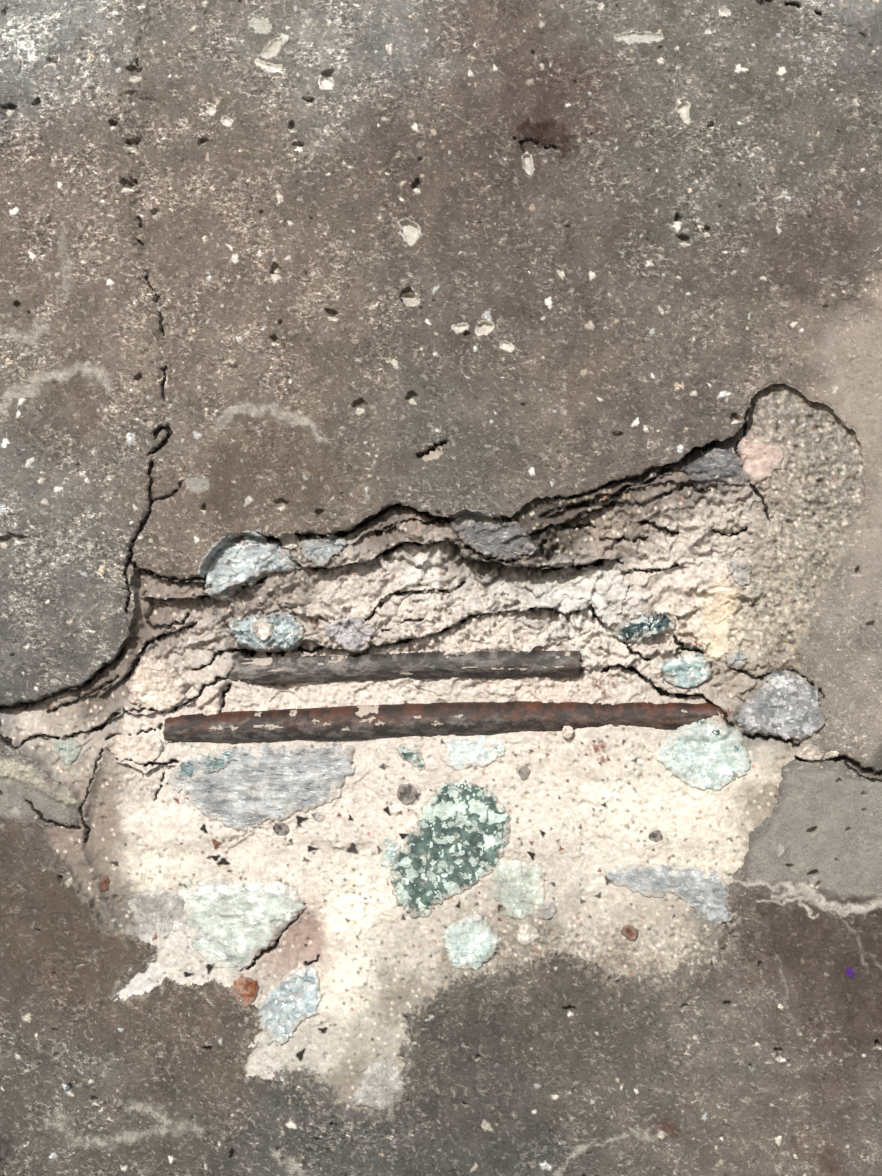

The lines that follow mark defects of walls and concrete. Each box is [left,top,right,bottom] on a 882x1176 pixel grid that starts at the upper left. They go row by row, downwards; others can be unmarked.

crack [765,0,822,16]
crack [145,275,165,336]
crack [123,365,206,613]
crack [0,701,29,750]
spalling [0,383,865,1123]
crack [25,800,81,829]